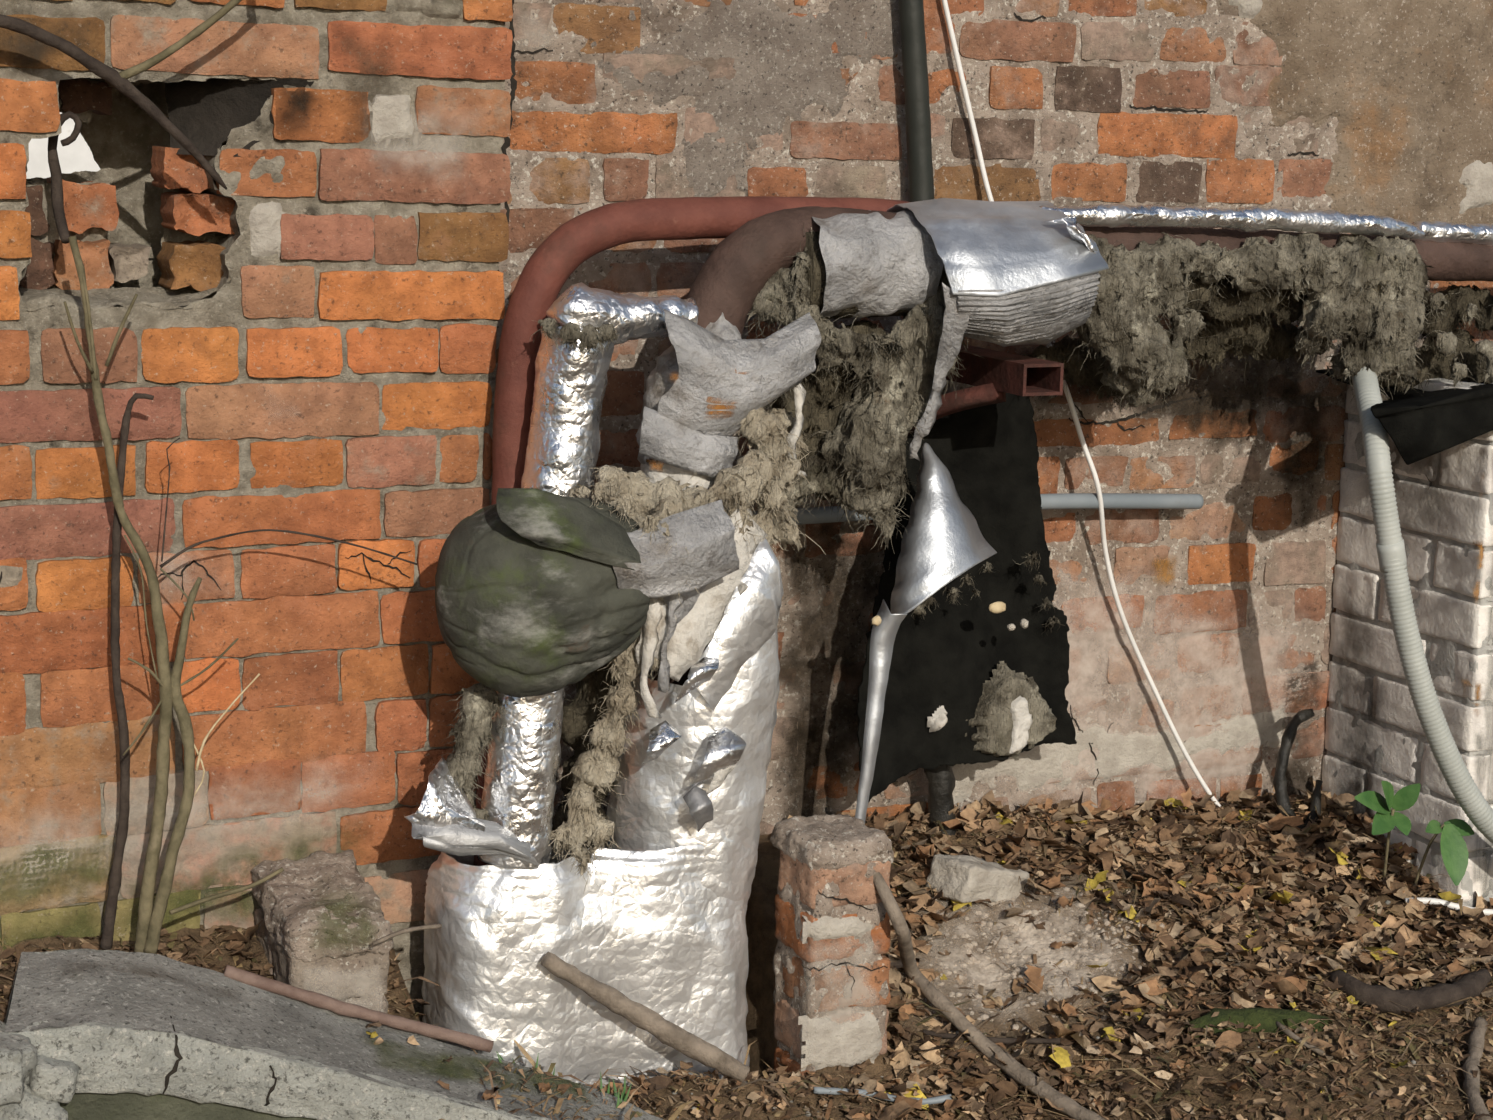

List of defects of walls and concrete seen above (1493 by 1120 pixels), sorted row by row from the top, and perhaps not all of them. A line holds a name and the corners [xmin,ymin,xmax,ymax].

peeling [1228,0,1263,19]
spalling [18,76,314,311]
leakage [1066,352,1324,523]
crack [345,550,412,581]
leakage [0,849,98,897]